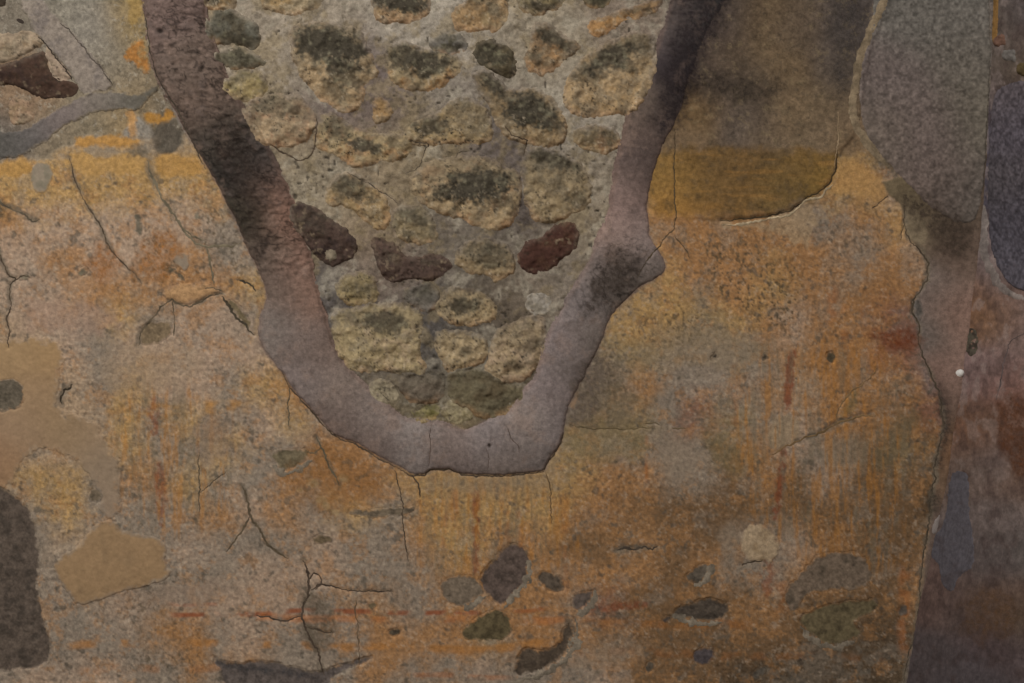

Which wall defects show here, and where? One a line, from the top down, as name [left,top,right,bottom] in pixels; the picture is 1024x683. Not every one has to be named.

crack [69,158,142,284]
crack [0,255,29,347]
crack [197,452,390,674]